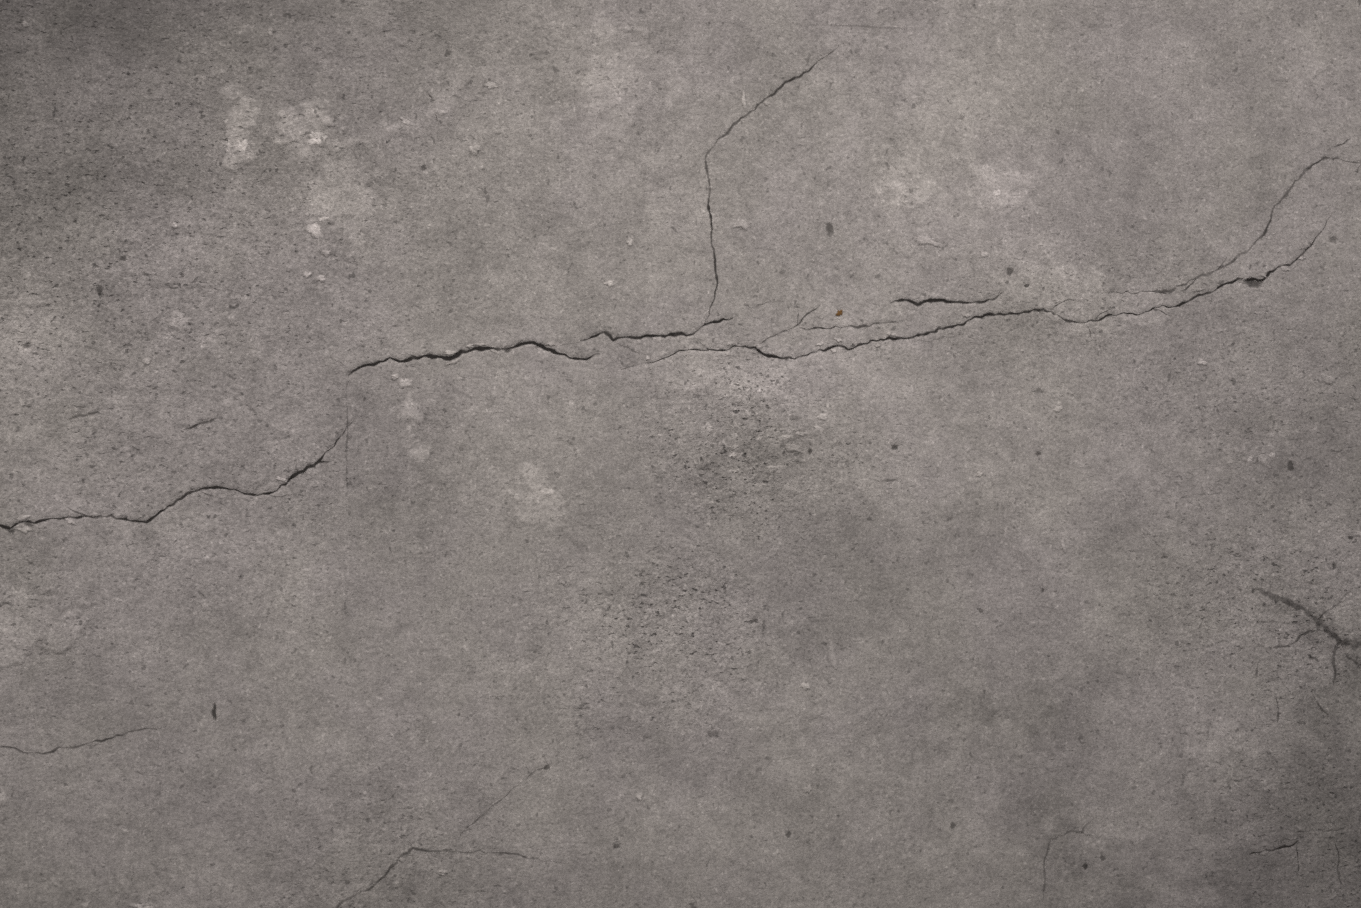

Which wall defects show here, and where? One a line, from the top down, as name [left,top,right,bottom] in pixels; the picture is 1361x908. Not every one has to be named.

crack [724,51,833,136]
crack [348,202,1327,376]
crack [0,422,352,529]